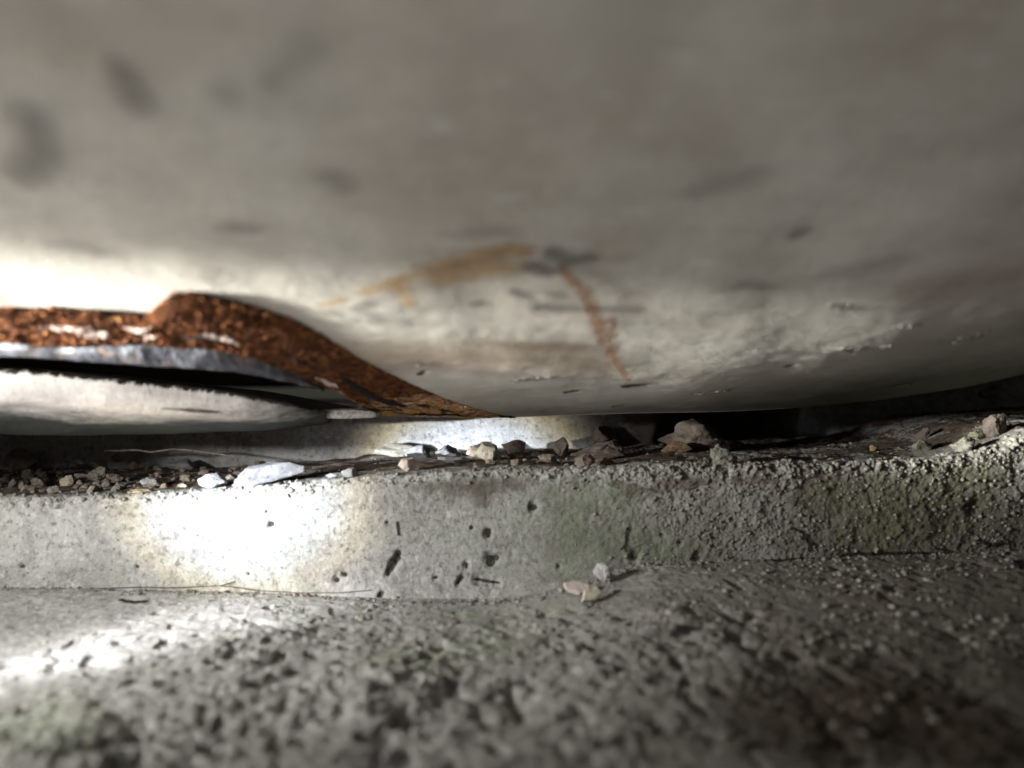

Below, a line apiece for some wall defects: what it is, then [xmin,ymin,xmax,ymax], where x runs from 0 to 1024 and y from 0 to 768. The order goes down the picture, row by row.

rust [557,266,630,381]